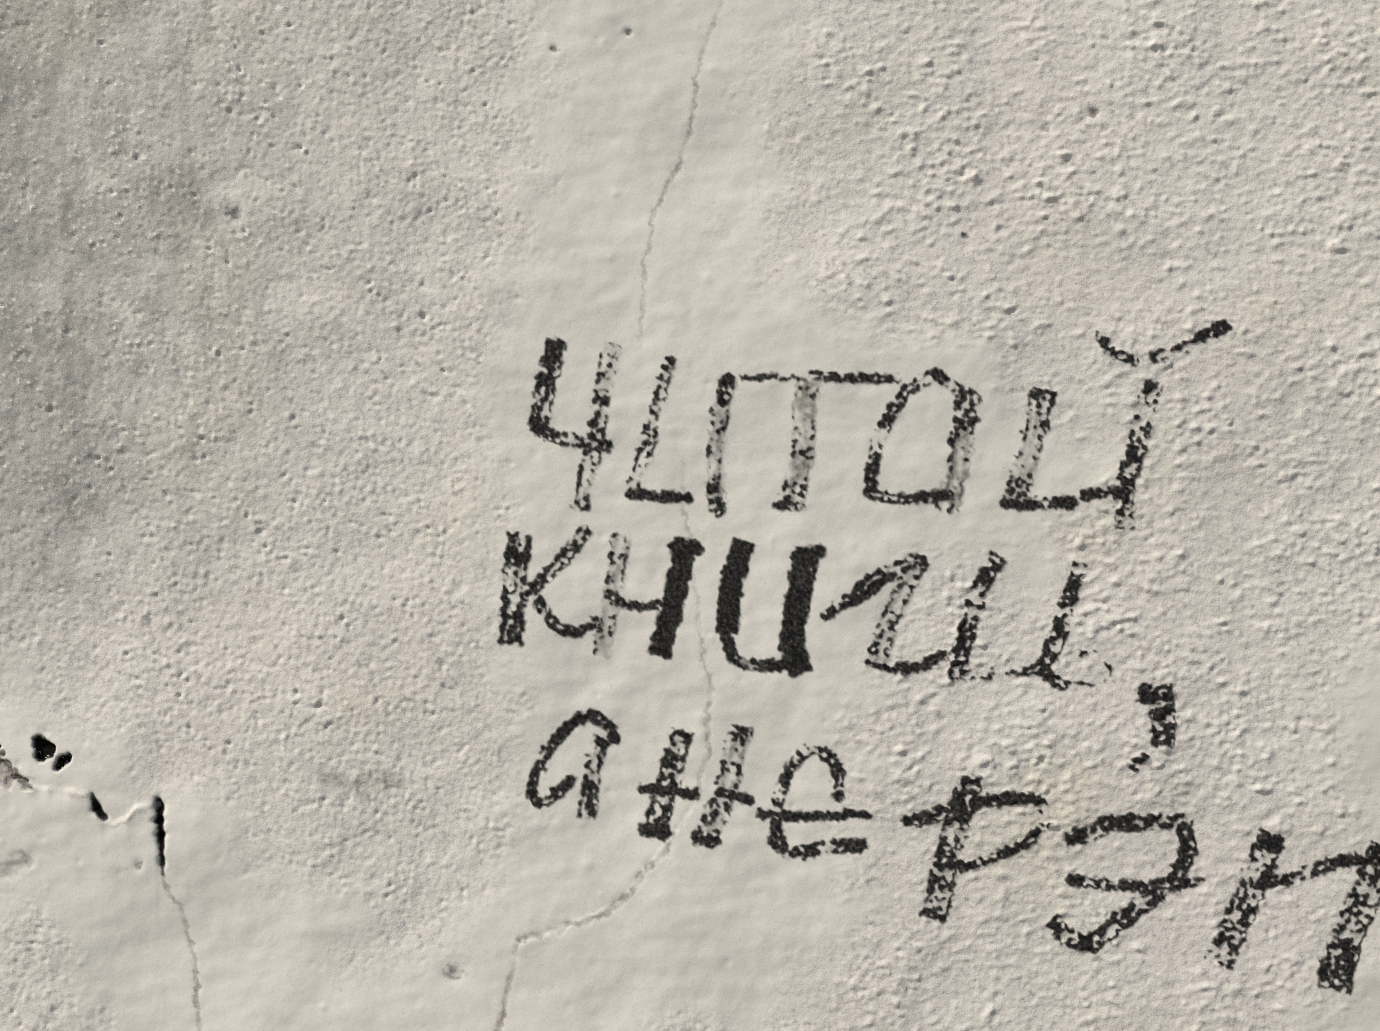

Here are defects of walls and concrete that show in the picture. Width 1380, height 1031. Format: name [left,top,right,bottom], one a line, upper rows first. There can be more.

spalling [0,752,26,787]
crack [154,798,166,875]